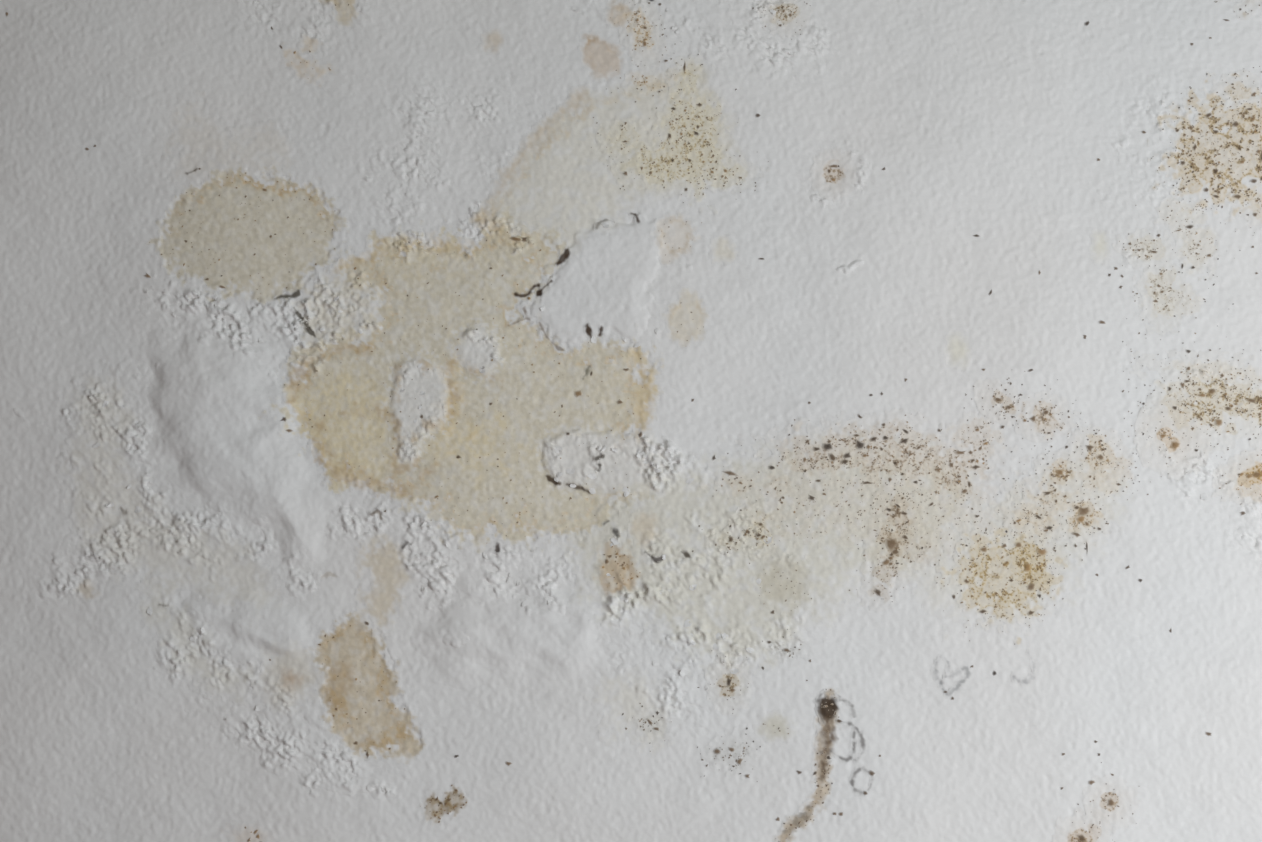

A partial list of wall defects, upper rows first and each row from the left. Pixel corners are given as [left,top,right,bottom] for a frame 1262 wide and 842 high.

damp [471,0,770,267]
damp [289,248,401,370]
damp [558,66,1262,842]